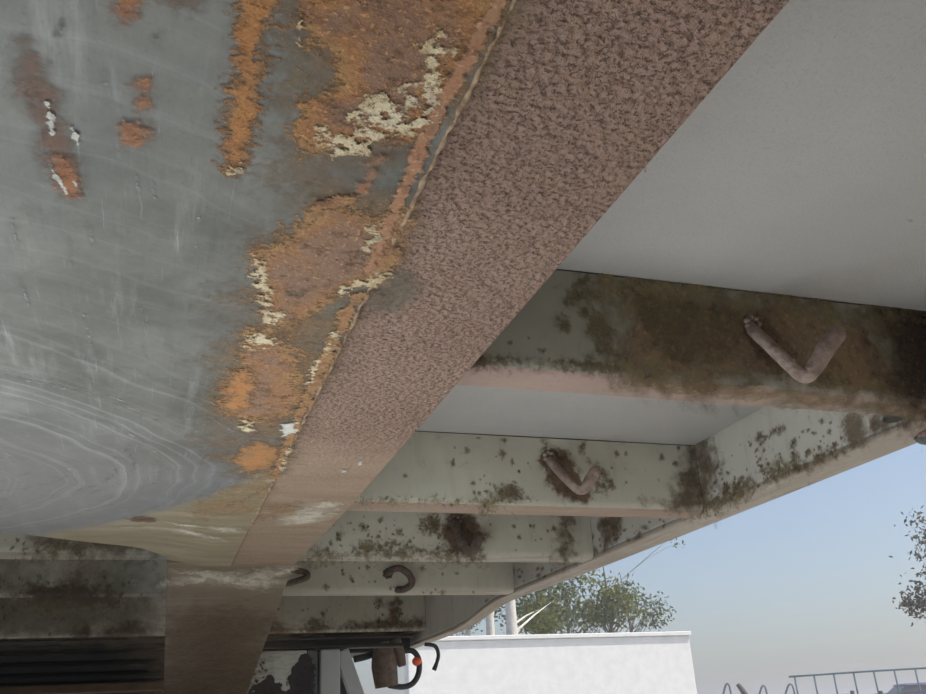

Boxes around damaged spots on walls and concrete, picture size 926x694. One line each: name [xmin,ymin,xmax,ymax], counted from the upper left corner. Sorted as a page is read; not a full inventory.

corrosion [116,122,152,148]
corrosion [174,0,528,539]
leakage [572,273,926,424]
corrosion [538,443,614,504]
corrosion [441,513,488,562]